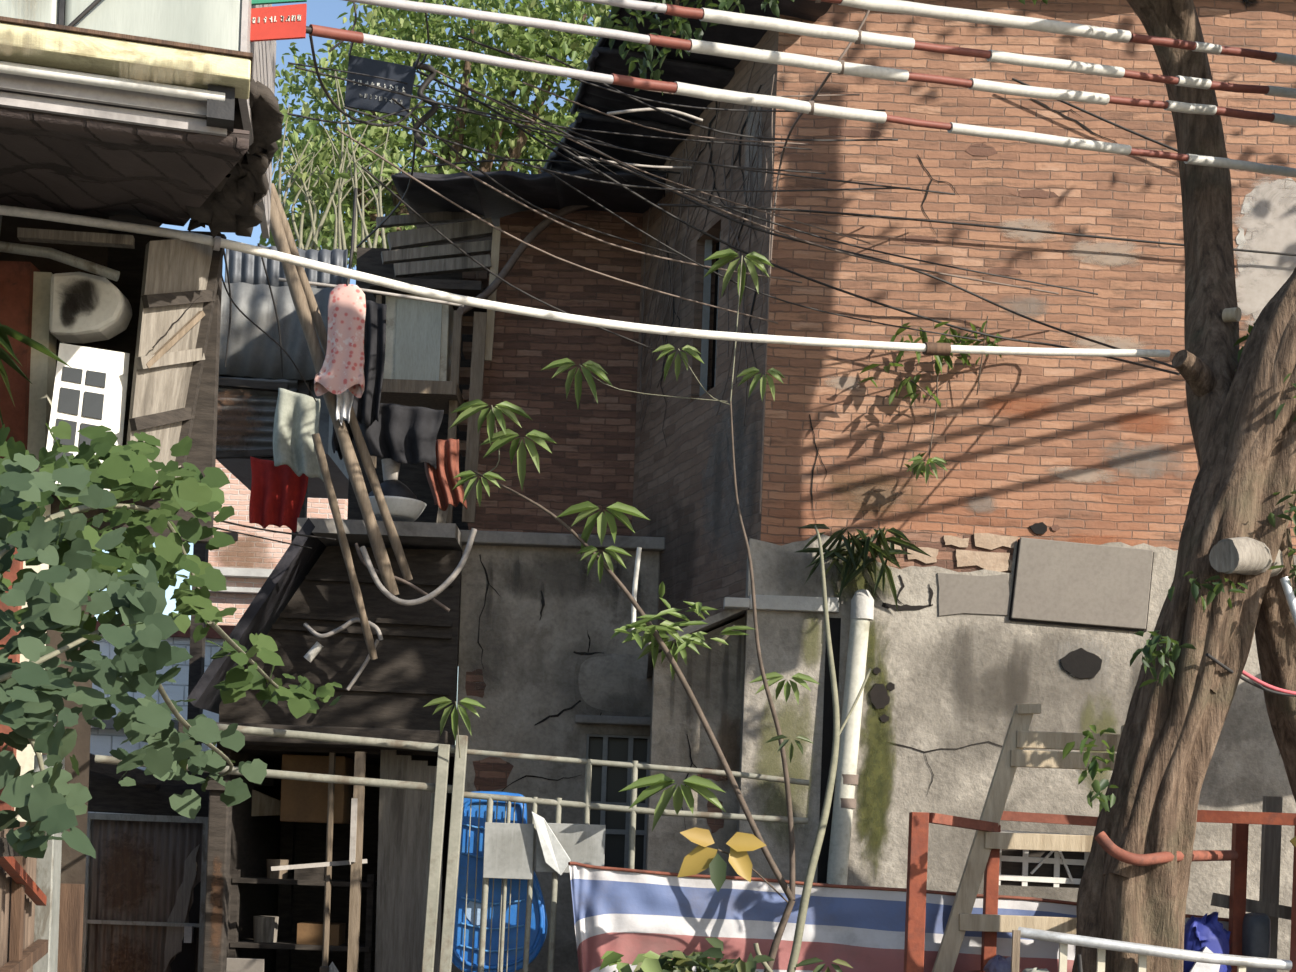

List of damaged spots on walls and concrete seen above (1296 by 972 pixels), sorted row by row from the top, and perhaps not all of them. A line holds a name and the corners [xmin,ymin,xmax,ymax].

spalling [872,529,1018,573]
leakage [866,622,876,668]
crack [534,700,602,726]
leakage [865,683,888,849]
crack [894,741,1025,796]